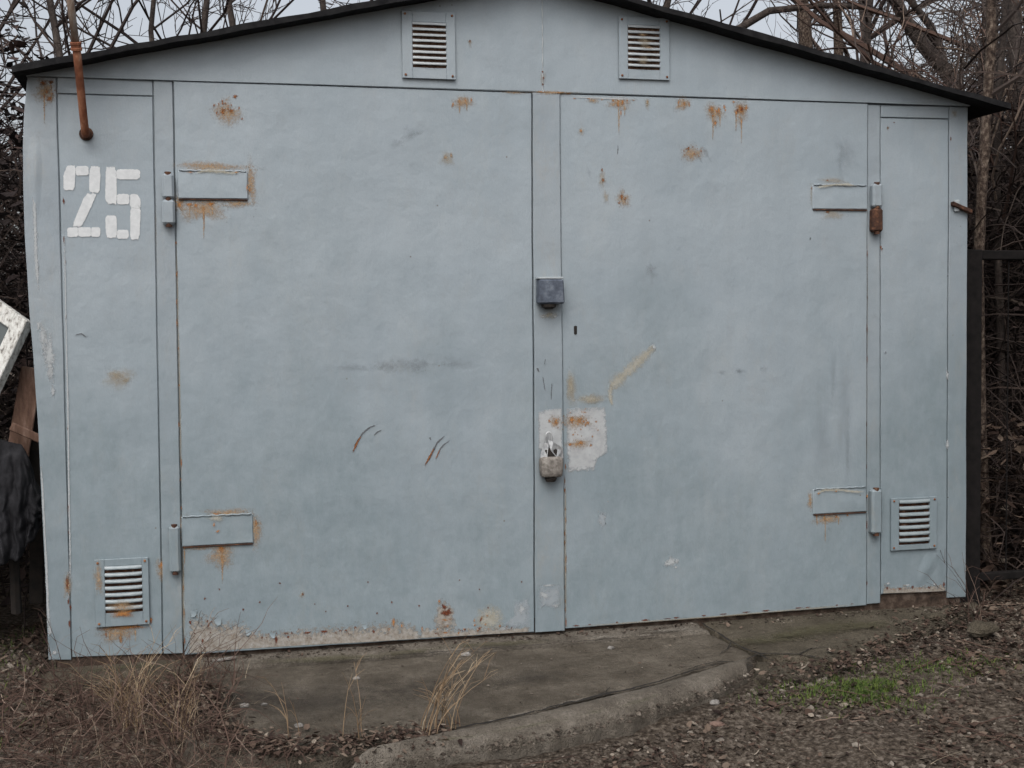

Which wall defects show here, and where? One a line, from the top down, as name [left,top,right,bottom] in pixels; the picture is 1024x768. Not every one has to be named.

rust [213,95,242,121]
rust [709,101,748,138]
rust [186,162,255,206]
rust [174,198,217,234]
rust [103,603,152,642]
peeling [189,601,529,653]